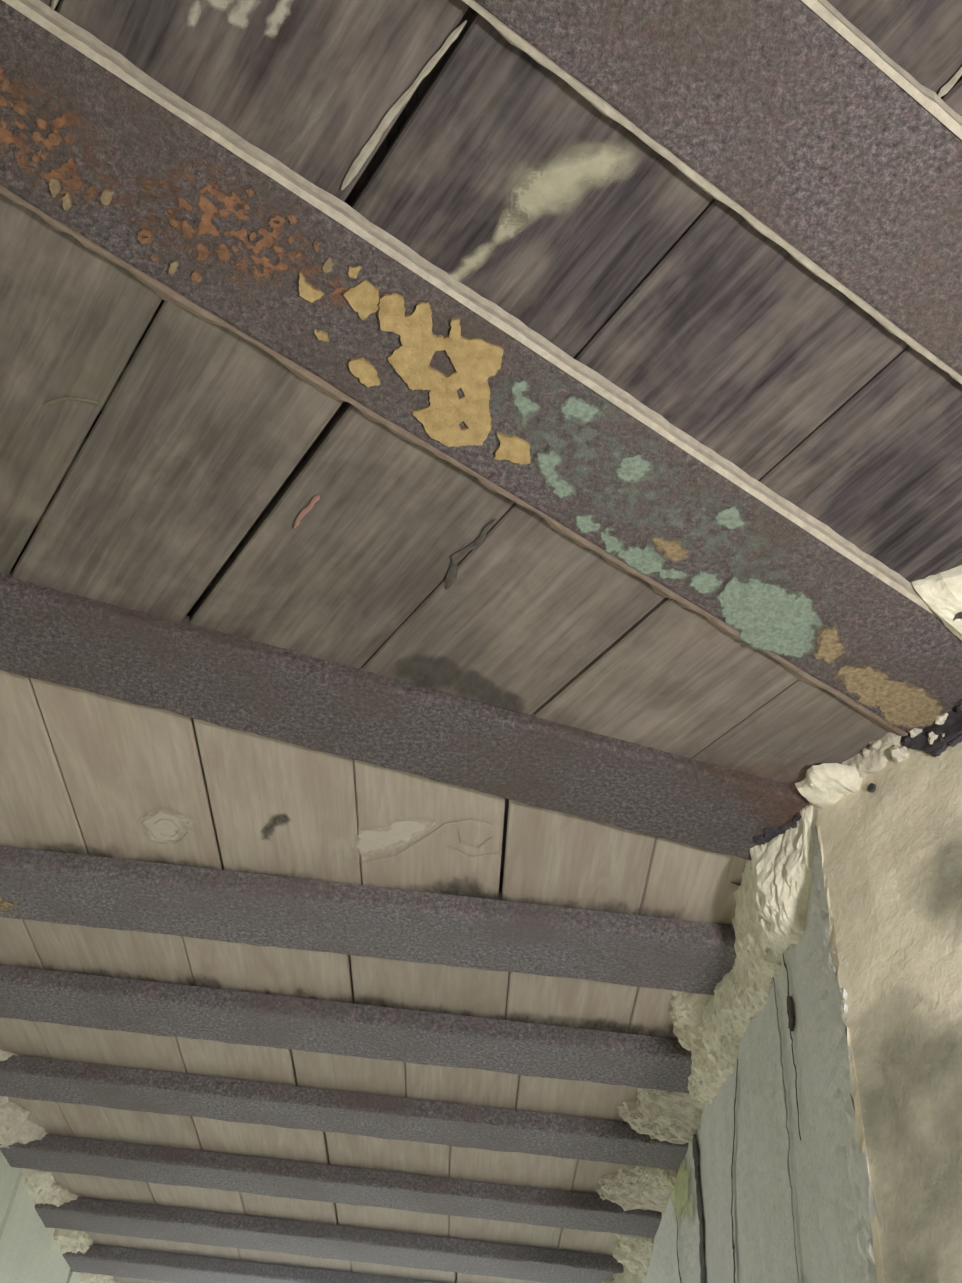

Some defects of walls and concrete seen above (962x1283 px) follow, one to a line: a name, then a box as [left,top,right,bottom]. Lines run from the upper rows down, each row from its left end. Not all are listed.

damp [189,0,255,27]
damp [266,0,289,35]
corrosion [0,66,132,210]
damp [449,146,629,282]
corrosion [136,172,350,305]
peeling [299,271,324,303]
peeling [314,329,329,342]
spalling [294,495,320,529]
peeling [343,265,962,763]